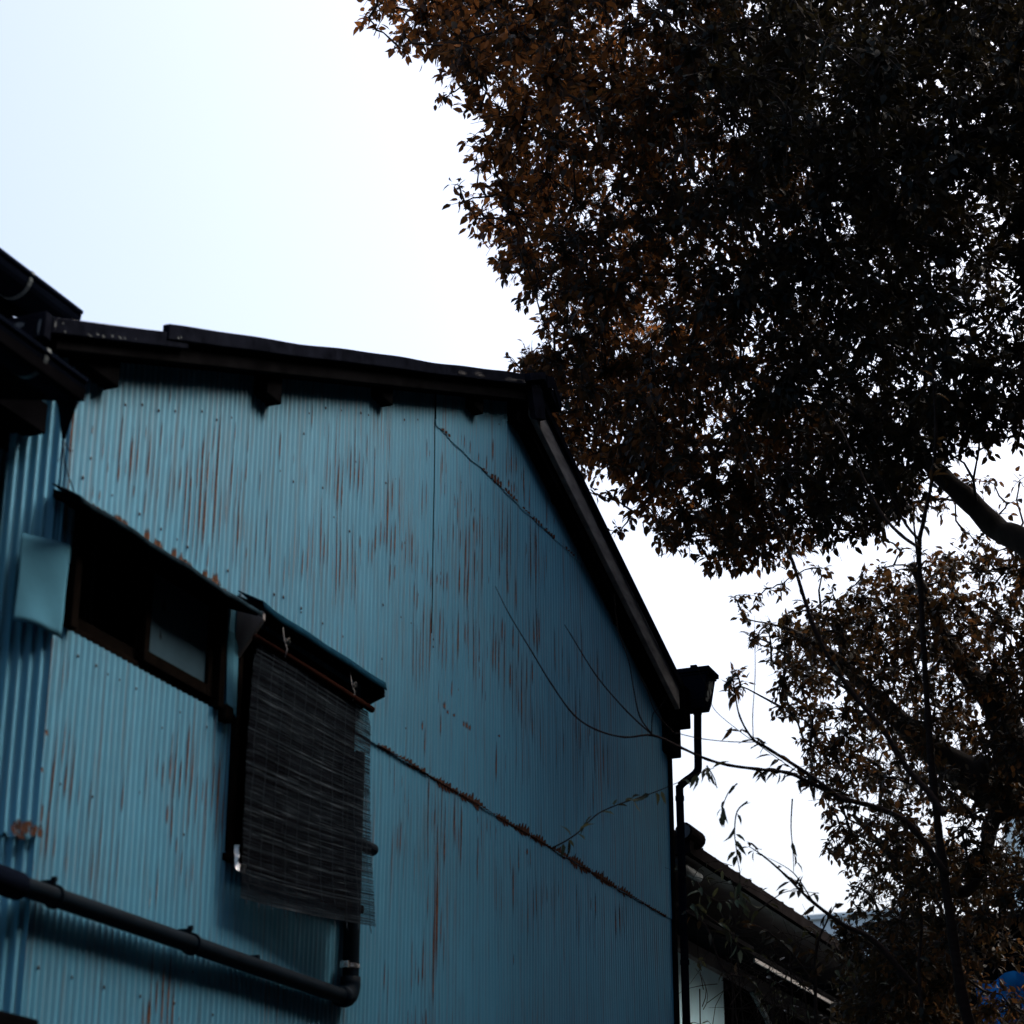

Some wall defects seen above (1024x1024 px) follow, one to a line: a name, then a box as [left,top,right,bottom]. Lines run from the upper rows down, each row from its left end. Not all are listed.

corrosion [102,420,271,590]
corrosion [283,428,564,774]
corrosion [11,634,104,890]
corrosion [142,958,181,1024]
corrosion [139,727,226,880]
corrosion [377,743,666,1001]